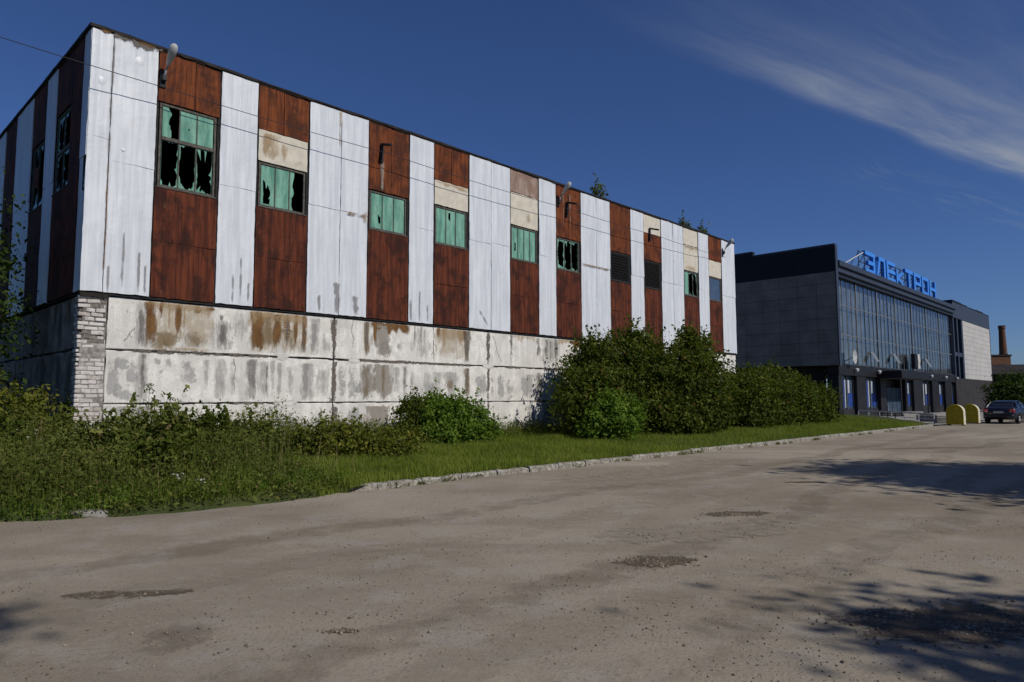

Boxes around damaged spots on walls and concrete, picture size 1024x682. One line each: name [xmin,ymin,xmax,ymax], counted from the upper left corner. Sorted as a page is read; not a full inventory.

corrosion [145,302,215,351]
corrosion [249,311,307,350]
corrosion [371,322,409,340]
water stain [248,359,268,397]